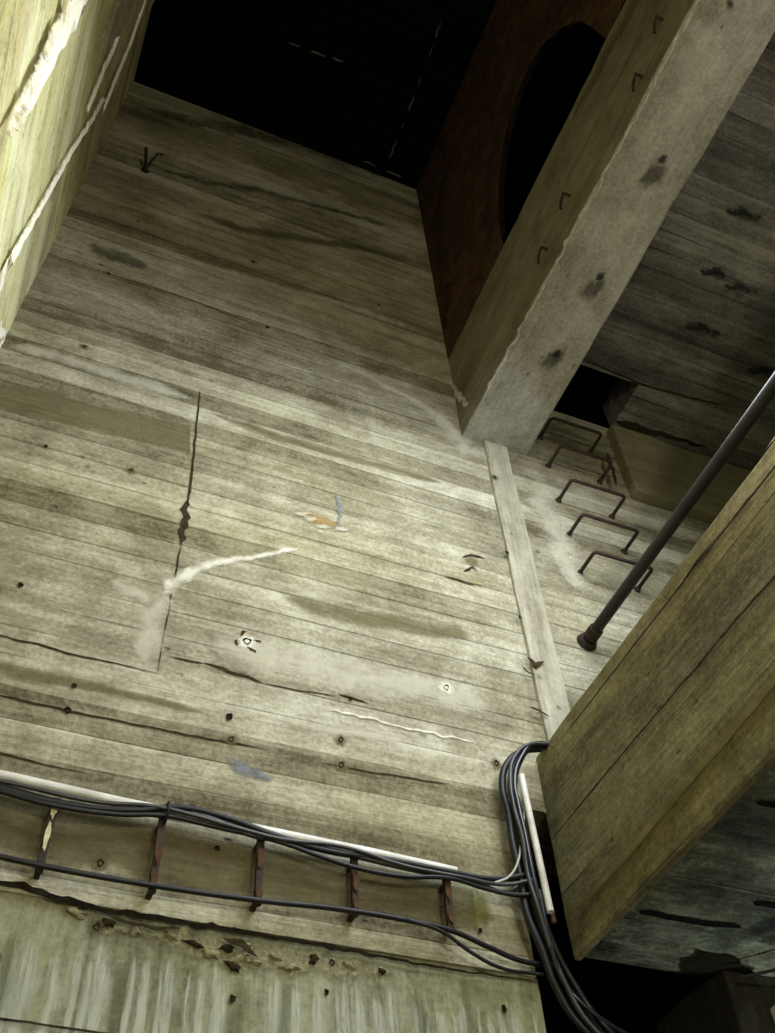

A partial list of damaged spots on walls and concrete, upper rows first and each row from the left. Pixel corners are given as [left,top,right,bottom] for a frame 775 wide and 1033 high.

peeling [0,0,146,293]
crack [0,392,367,703]
water stain [116,548,294,658]
spalling [65,905,392,983]